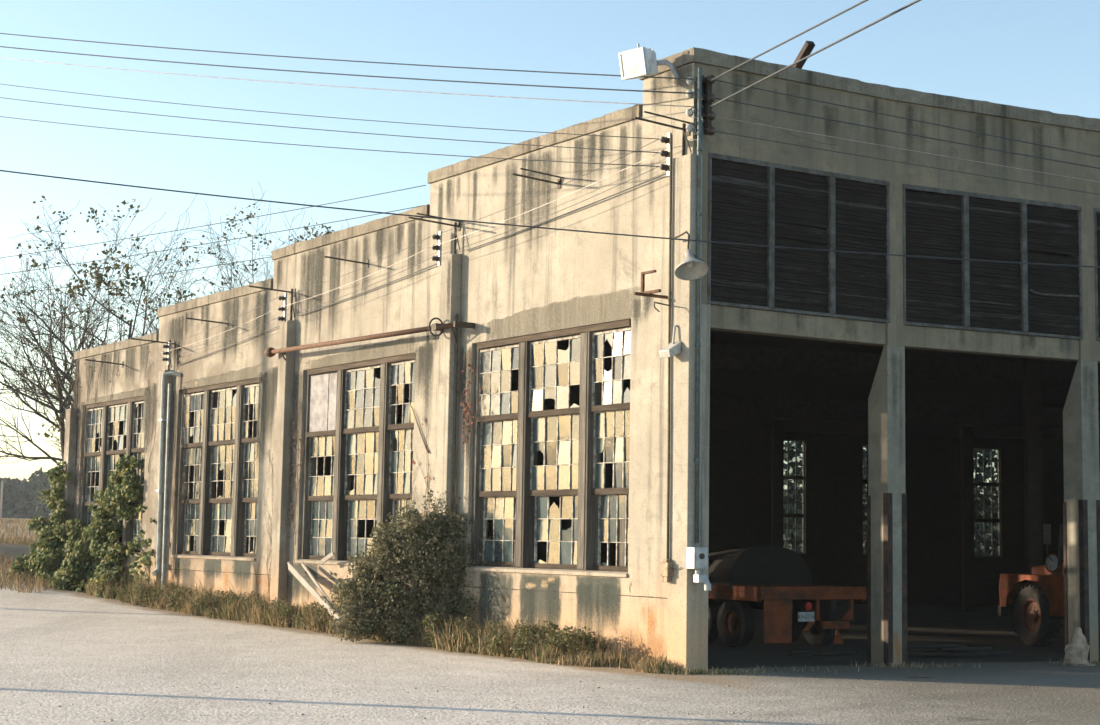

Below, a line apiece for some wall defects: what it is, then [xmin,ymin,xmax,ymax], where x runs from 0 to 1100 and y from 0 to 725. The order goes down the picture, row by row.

damp [575,136,594,176]
damp [620,127,641,181]
damp [438,184,450,231]
damp [521,160,535,222]
damp [363,222,422,271]
damp [306,242,347,338]
damp [479,573,560,628]
damp [576,576,620,625]